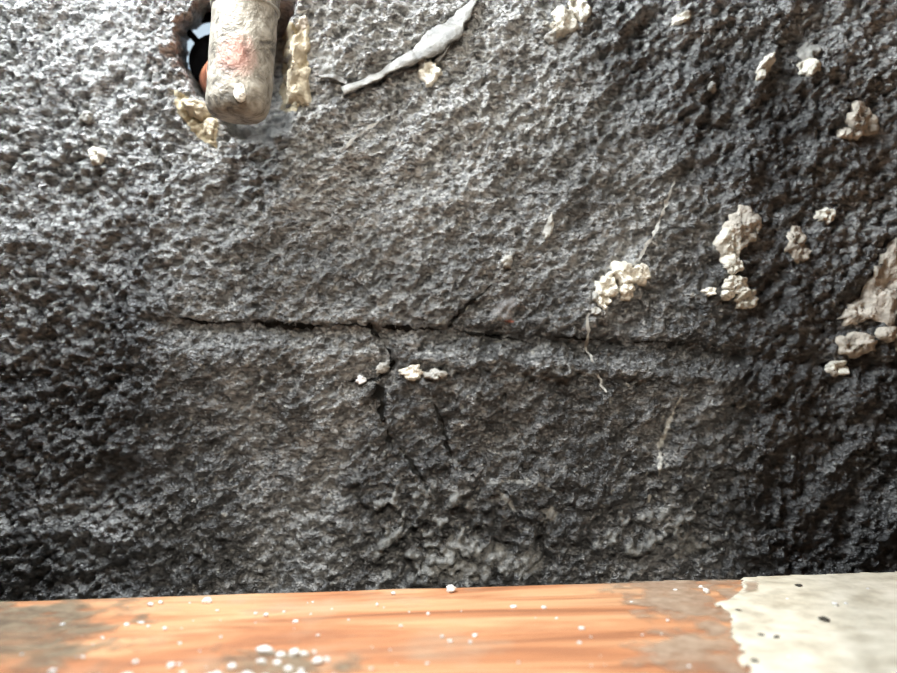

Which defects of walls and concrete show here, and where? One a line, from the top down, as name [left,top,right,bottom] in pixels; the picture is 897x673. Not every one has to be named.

spalling [590,260,651,316]
spalling [700,204,762,309]
crack [172,284,607,499]
crack [634,339,686,347]